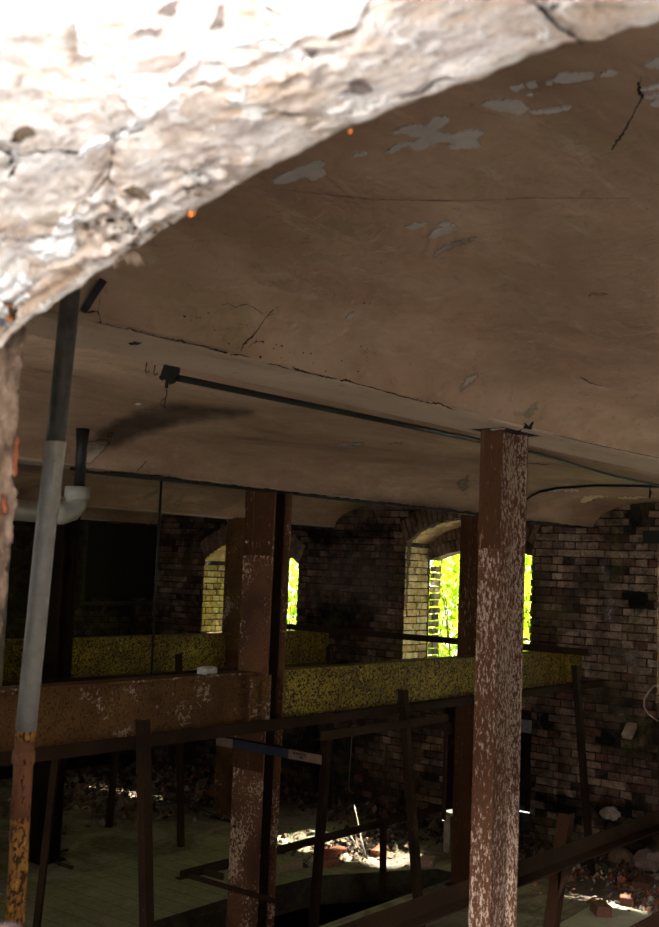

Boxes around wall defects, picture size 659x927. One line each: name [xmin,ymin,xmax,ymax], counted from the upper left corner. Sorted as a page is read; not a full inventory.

crack [526,0,583,45]
peeling [482,70,618,115]
peeling [385,115,484,154]
crack [611,80,644,151]
crack [0,148,79,178]
peeling [272,160,326,184]